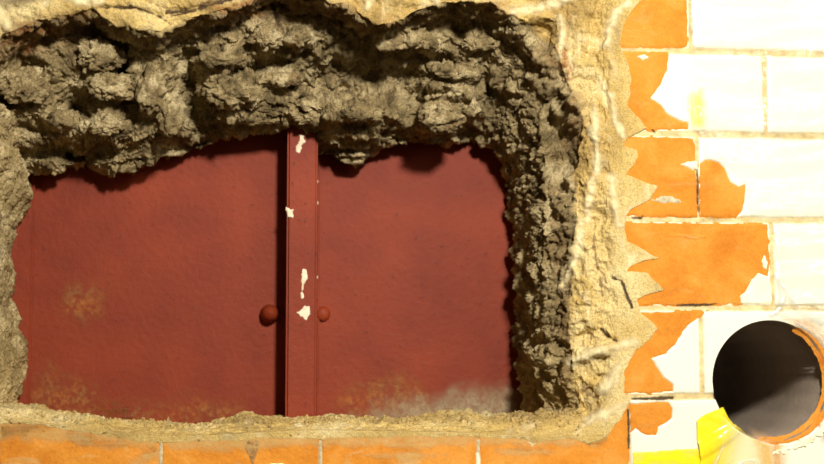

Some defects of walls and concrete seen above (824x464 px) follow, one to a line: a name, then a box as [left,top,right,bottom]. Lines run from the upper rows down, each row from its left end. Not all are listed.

crack [102,0,232,24]
crack [271,0,280,26]
spalling [0,0,584,413]
peeling [740,255,772,304]